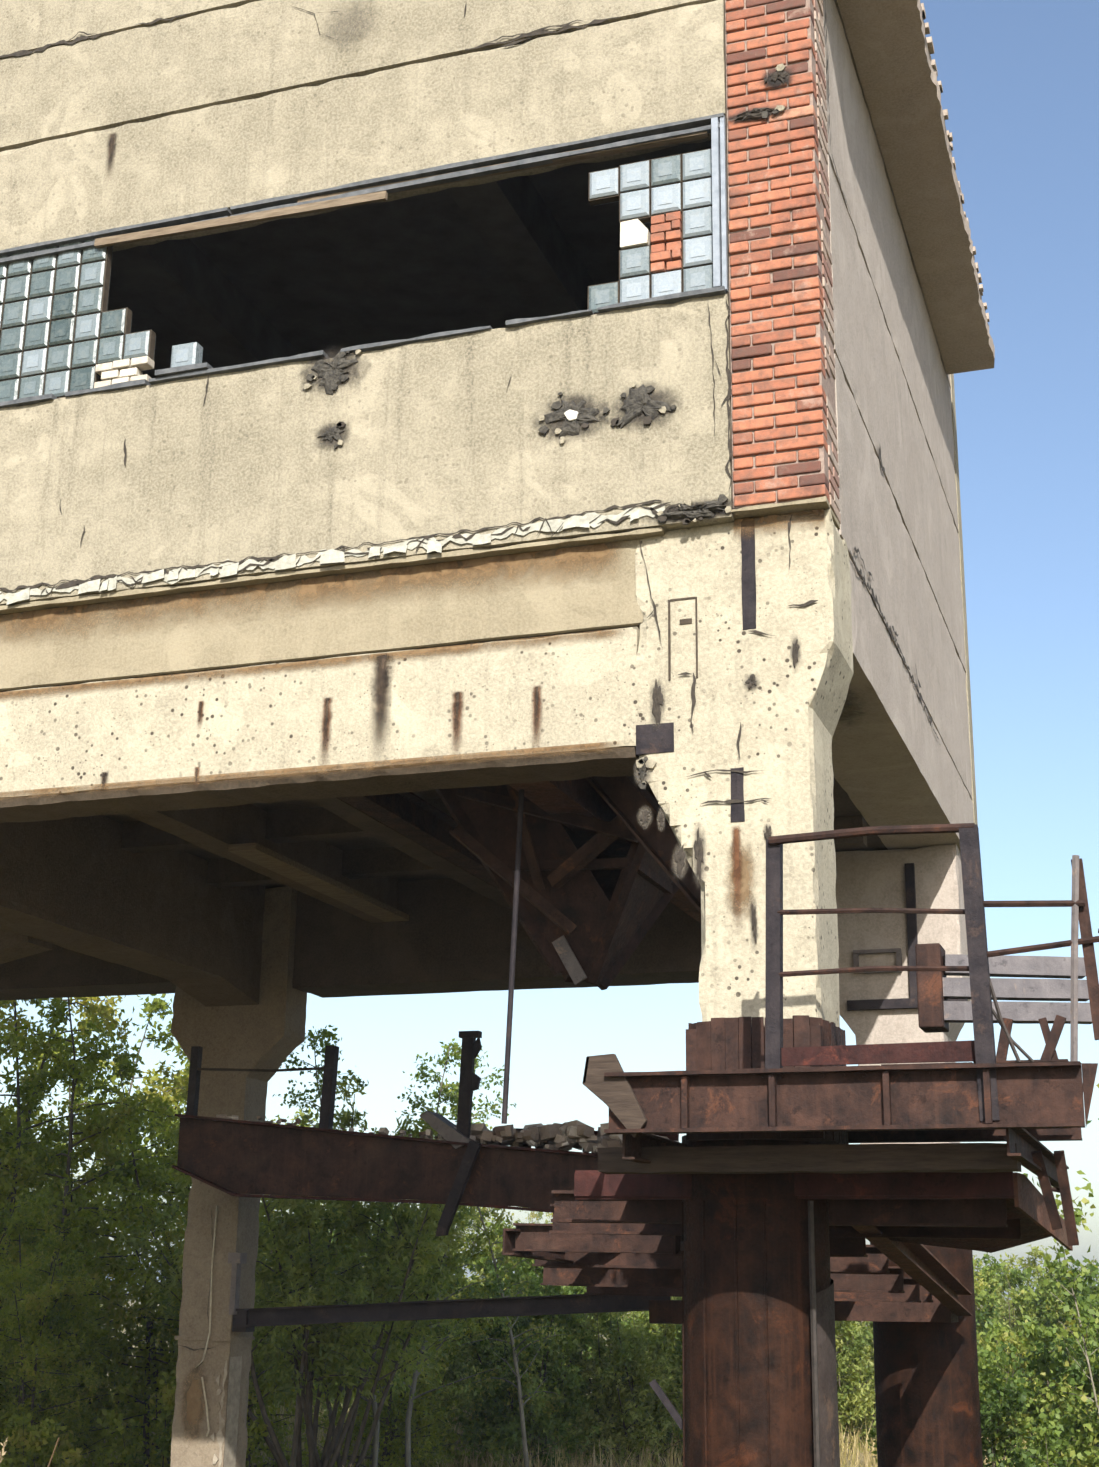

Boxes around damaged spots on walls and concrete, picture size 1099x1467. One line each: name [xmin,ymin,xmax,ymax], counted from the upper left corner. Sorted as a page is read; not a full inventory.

spalling [303,349,362,395]
spalling [318,421,346,449]
spalling [538,383,677,444]
peeling [0,494,736,605]